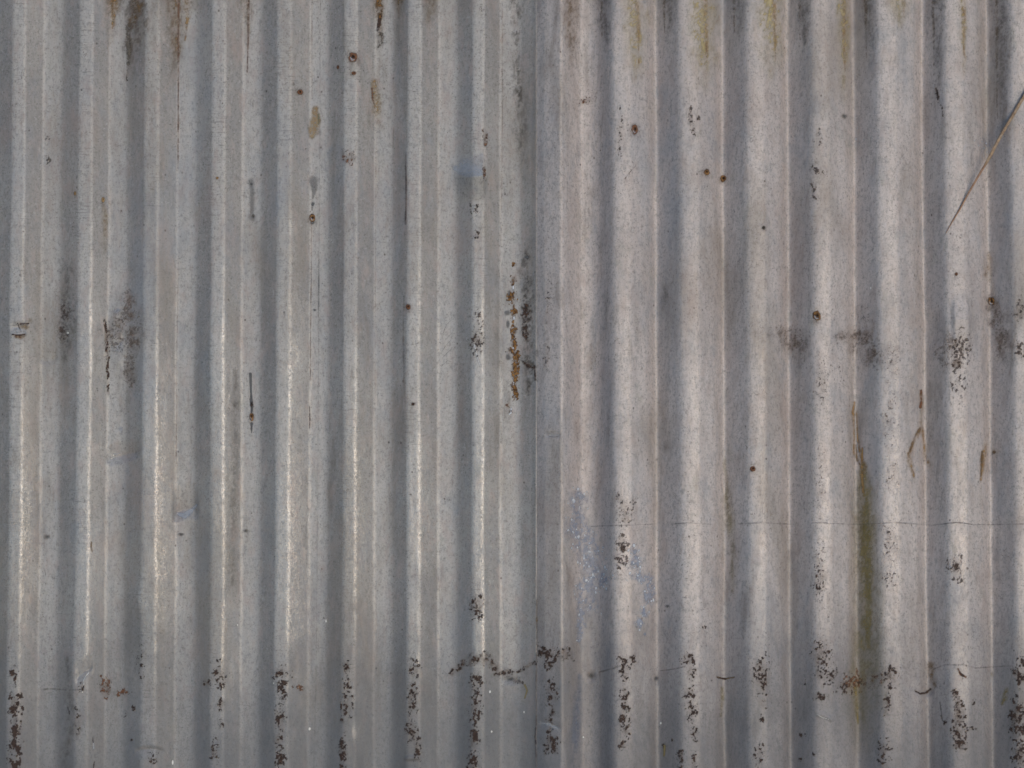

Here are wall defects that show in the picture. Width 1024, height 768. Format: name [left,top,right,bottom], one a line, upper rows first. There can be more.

corrosion [505,262,521,415]
corrosion [949,327,972,392]
corrosion [449,487,655,768]
corrosion [6,670,24,768]
corrosion [203,658,227,759]
corrosion [272,664,303,768]
corrosion [340,660,353,721]
corrosion [662,654,698,768]
corrosion [752,651,770,723]
corrosion [943,689,976,750]